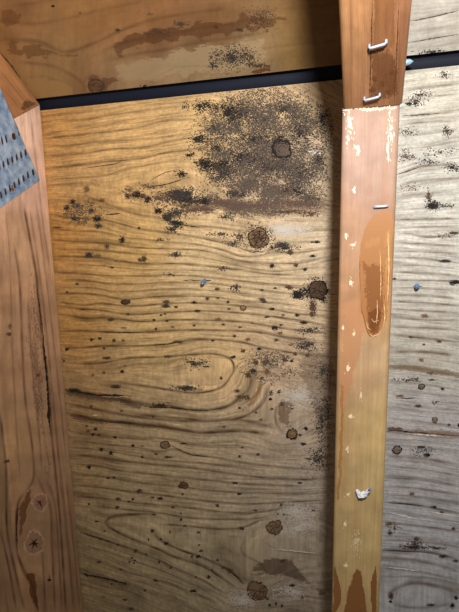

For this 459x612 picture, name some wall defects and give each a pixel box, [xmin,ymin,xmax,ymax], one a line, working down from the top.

mould [208,42,270,74]
mould [405,88,436,107]
mould [118,92,333,241]
mould [398,147,459,174]
mould [400,183,454,213]
crack [36,286,50,427]
mould [244,347,272,379]
leakage [282,210,396,478]
leakage [333,563,377,612]